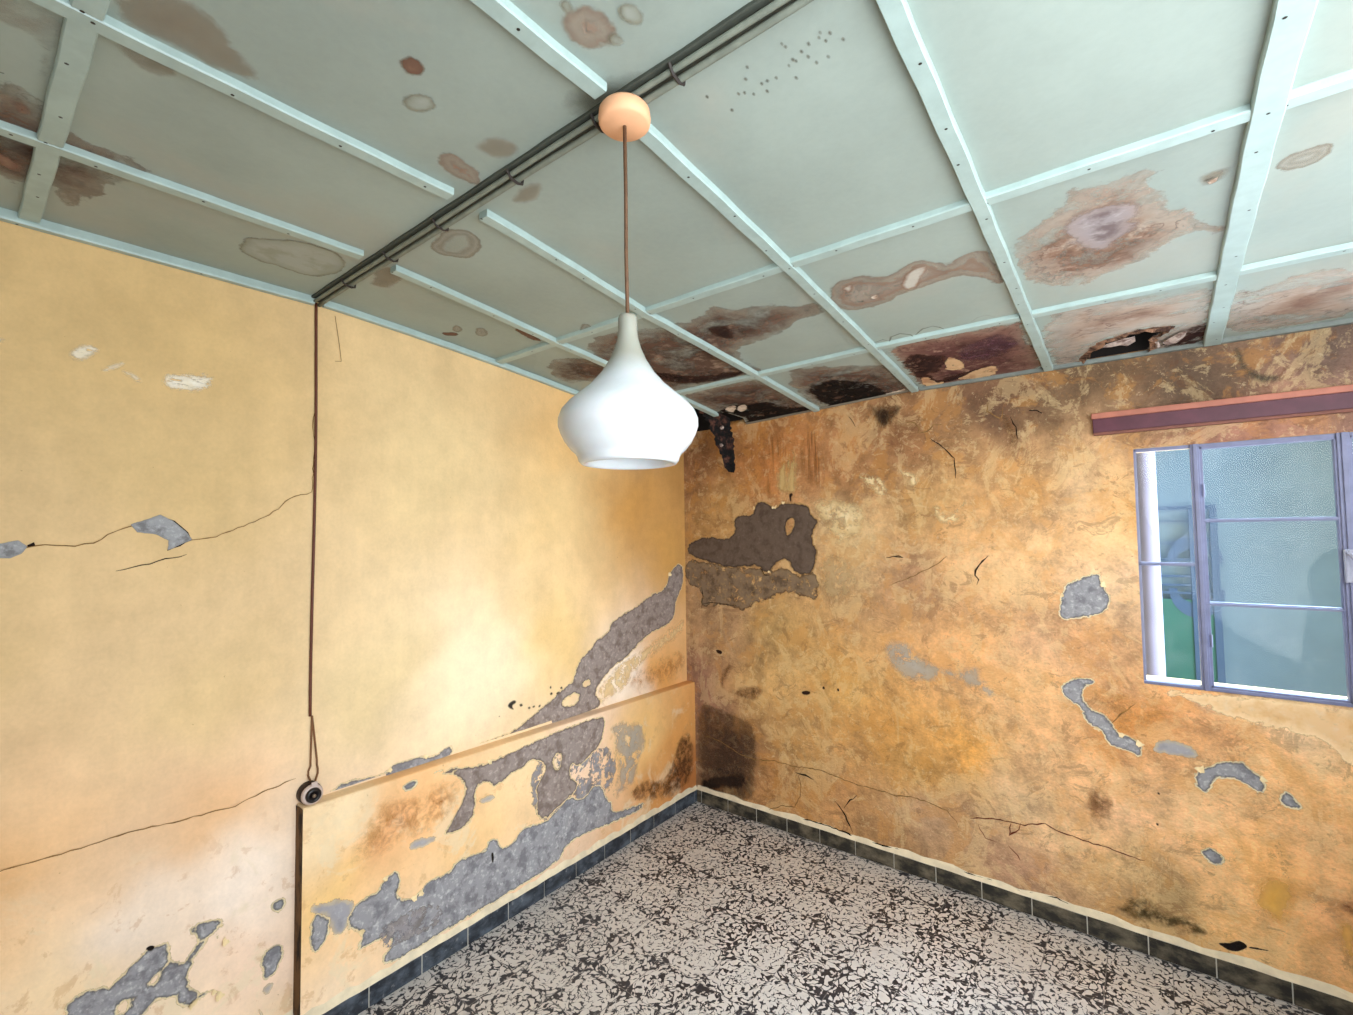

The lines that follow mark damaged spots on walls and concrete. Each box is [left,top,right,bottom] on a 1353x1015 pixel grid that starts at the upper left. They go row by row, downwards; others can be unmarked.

water stain [0,95,40,179]
water stain [1024,176,1196,286]
water stain [556,334,618,380]
water stain [638,290,1212,426]
peeling [1103,336,1135,348]
crack [0,403,315,571]
flaking render [309,493,819,965]
water stain [634,705,755,799]
flaking render [1060,678,1303,810]
crack [0,778,296,872]
flaking render [271,897,286,913]
flaking render [64,918,231,1015]